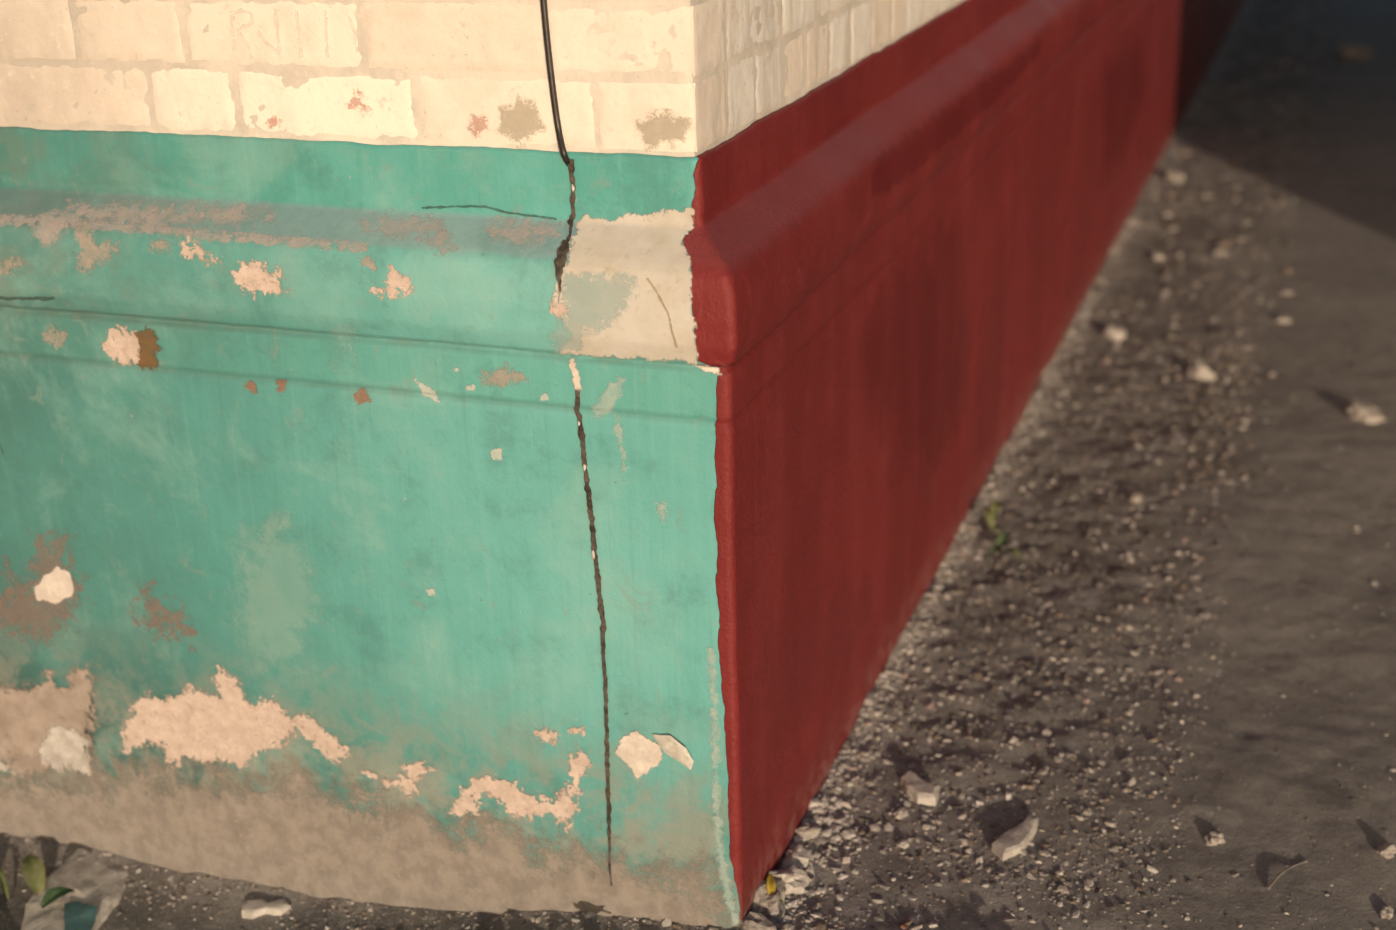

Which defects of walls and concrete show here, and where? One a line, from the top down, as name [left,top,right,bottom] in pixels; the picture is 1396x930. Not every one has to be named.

peeling [101,324,140,366]
peeling [0,198,459,300]
peeling [412,377,441,403]
peeling [466,362,525,391]
crack [549,159,576,321]
flaking render [486,207,722,375]
peeling [592,378,627,472]
crack [568,357,613,886]
flaking render [0,662,100,782]
peeling [120,664,436,800]
peeling [449,723,593,833]
damp [0,749,750,930]